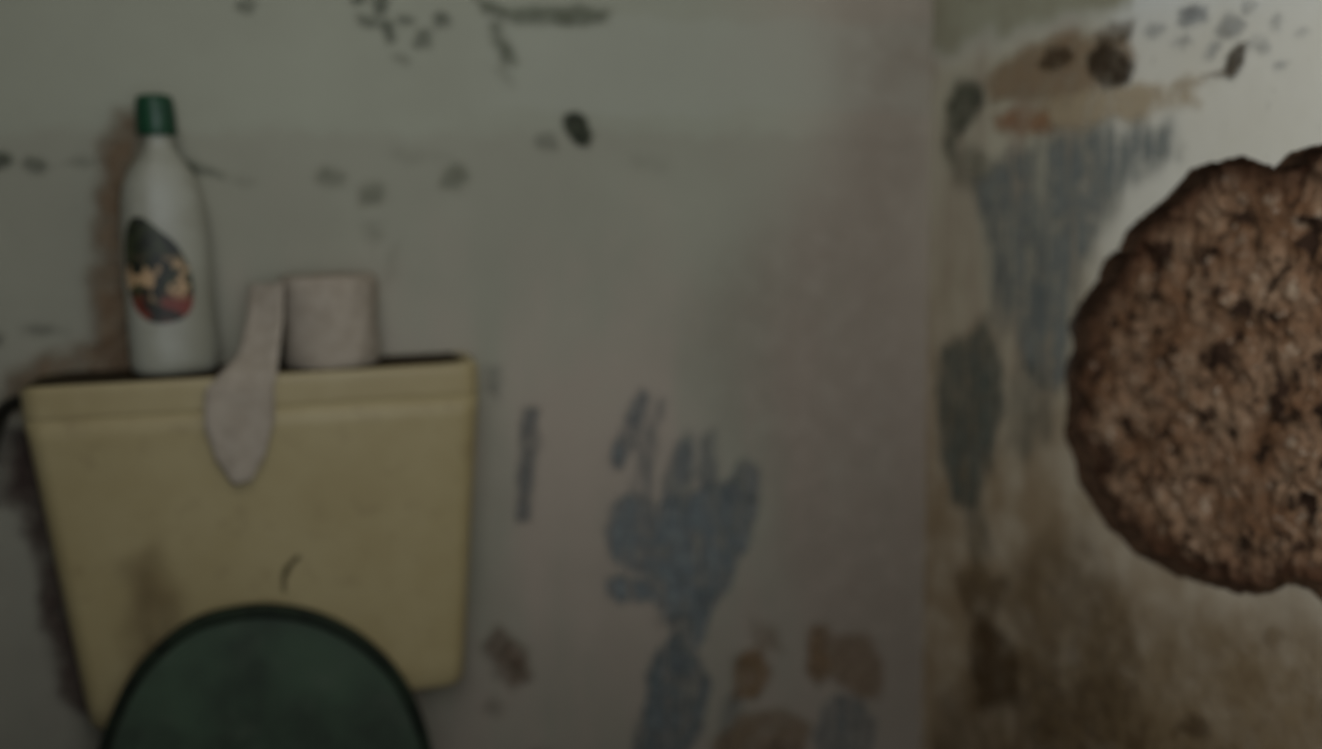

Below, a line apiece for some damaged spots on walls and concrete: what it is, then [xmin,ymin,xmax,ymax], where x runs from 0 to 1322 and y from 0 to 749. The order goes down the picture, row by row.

flaking render [563,113,592,146]
peeling [988,23,1162,131]
flaking render [1064,144,1322,601]